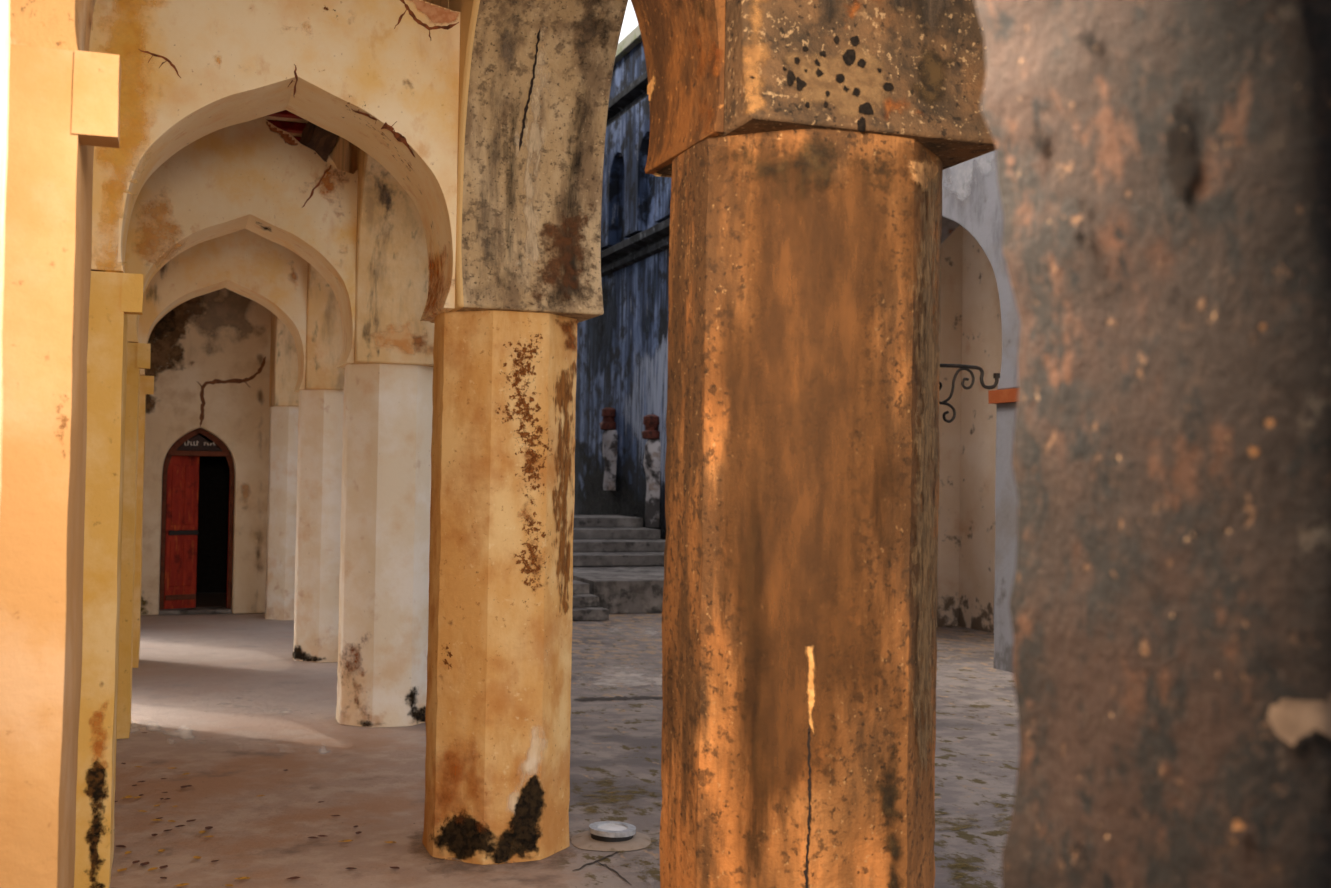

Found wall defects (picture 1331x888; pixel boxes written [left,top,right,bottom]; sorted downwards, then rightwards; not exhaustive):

crack [394,0,459,39]
crack [302,165,332,207]
damp [530,215,592,305]
crack [197,357,266,427]
peeling [1267,694,1331,746]
damp [84,712,112,888]
damp [432,775,545,864]
peeling [509,728,545,813]
crack [803,725,811,888]
peeling [1232,819,1245,844]